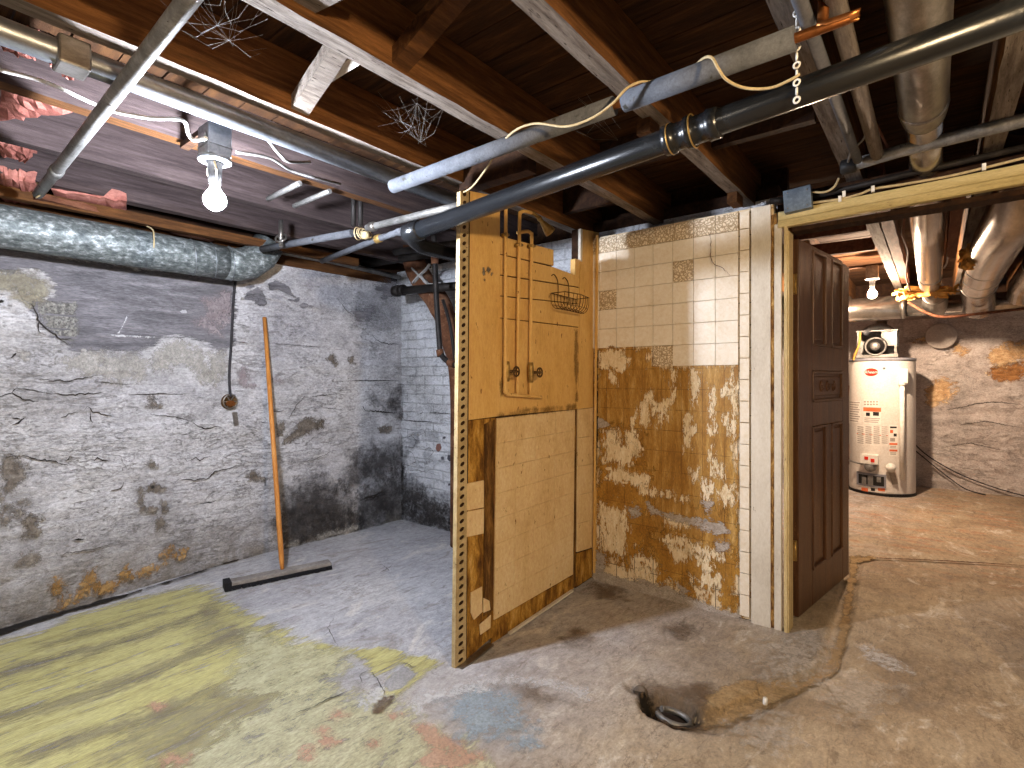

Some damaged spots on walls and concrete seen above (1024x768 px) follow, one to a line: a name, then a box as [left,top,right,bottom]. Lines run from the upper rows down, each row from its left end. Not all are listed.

peeling [598,349,632,387]
flaking render [985,340,1024,382]
crack [0,375,218,429]
damp [372,387,404,419]
flaking render [924,376,960,408]
crack [10,454,106,465]
crack [173,456,239,504]
damp [271,441,450,549]
peeling [595,367,740,602]
rust [48,544,189,613]
crack [870,558,1024,566]